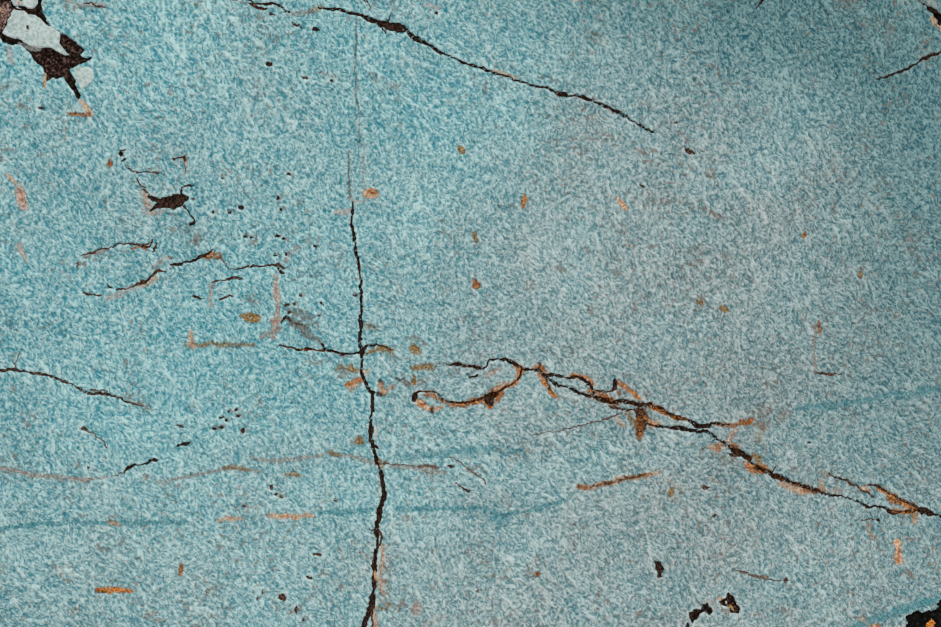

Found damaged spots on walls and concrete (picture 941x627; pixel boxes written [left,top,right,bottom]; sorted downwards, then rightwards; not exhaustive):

spalling [0,0,94,117]
crack [233,0,655,133]
spalling [136,177,196,226]
crack [76,239,286,304]
crack [278,140,486,627]
rust [415,363,557,413]
rust [570,374,687,439]
rust [578,473,652,490]
crack [412,357,941,535]
rust [709,419,835,494]
peeling [686,592,740,627]
spalling [906,600,941,627]